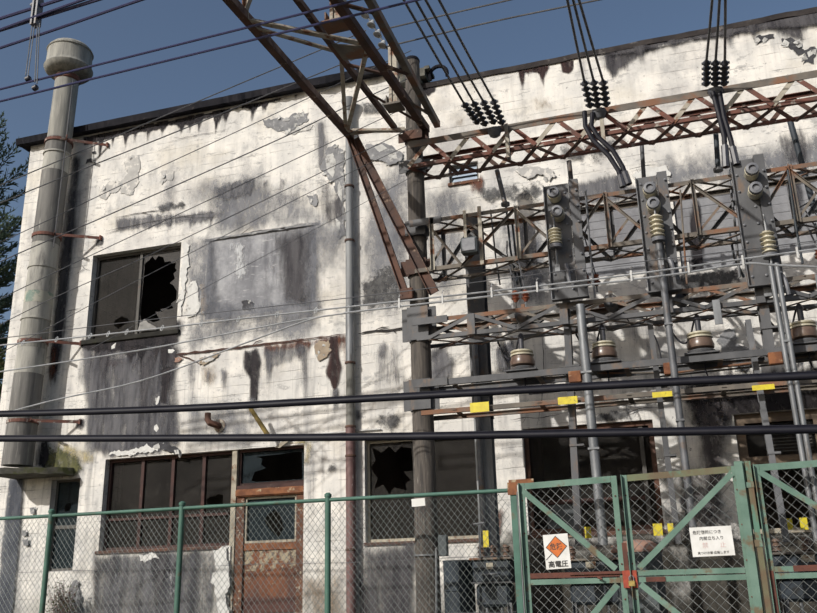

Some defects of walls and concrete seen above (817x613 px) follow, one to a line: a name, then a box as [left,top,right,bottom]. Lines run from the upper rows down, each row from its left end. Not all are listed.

peeling [753,34,817,65]
water stain [518,66,549,85]
water stain [561,61,573,73]
water stain [362,97,389,114]
water stain [49,157,79,380]
peeling [176,242,208,318]
rust [265,335,345,352]
water stain [76,320,181,457]
peeling [109,442,182,458]
peeling [211,546,232,613]